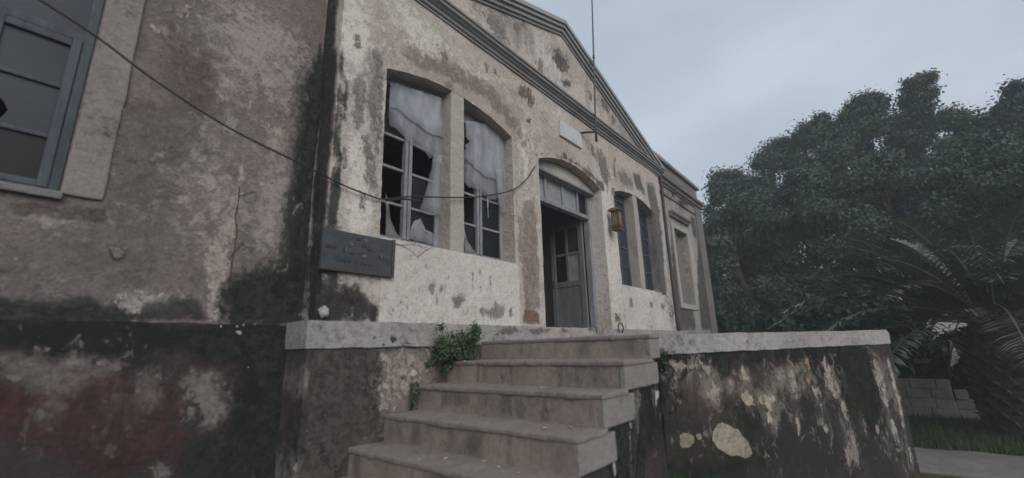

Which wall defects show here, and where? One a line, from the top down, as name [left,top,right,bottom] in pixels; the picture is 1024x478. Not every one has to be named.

crack [223,188,258,317]
leakage [140,0,383,478]
spalling [680,422,752,459]